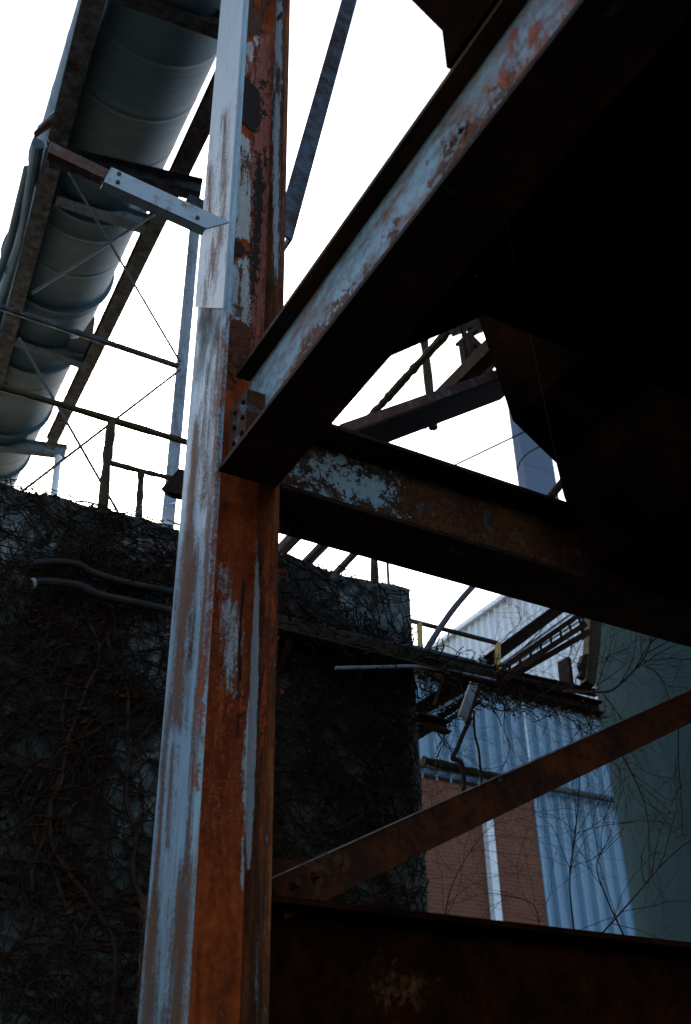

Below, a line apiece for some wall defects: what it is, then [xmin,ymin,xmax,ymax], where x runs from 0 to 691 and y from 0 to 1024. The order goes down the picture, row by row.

corrosion [274,0,577,391]
corrosion [138,33,288,1024]
peeling [218,538,260,891]
peeling [290,446,411,519]